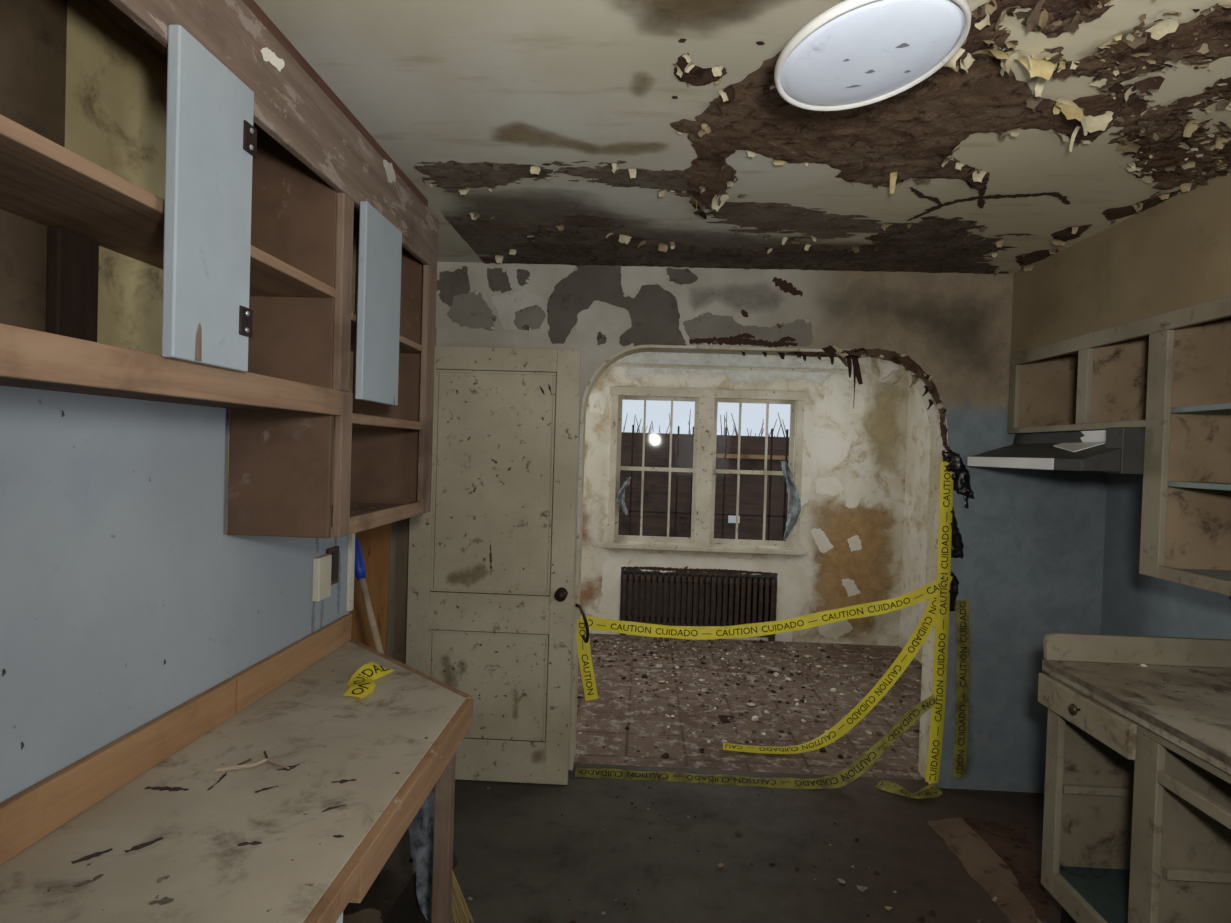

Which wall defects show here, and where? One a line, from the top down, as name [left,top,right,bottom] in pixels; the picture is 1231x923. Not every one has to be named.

damp [633,0,763,26]
crack [907,178,1071,221]
peeling [414,0,1231,451]